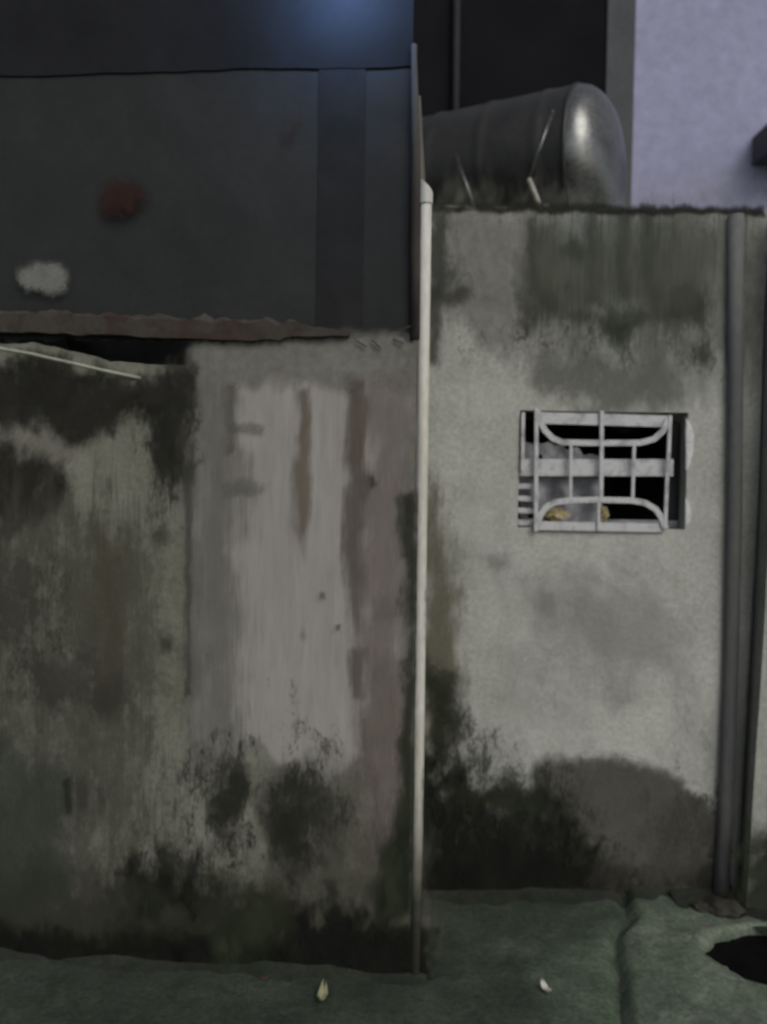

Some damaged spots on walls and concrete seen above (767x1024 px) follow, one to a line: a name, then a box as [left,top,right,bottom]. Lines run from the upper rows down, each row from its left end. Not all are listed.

damp [429,201,765,363]
damp [0,352,439,980]
damp [400,489,719,897]